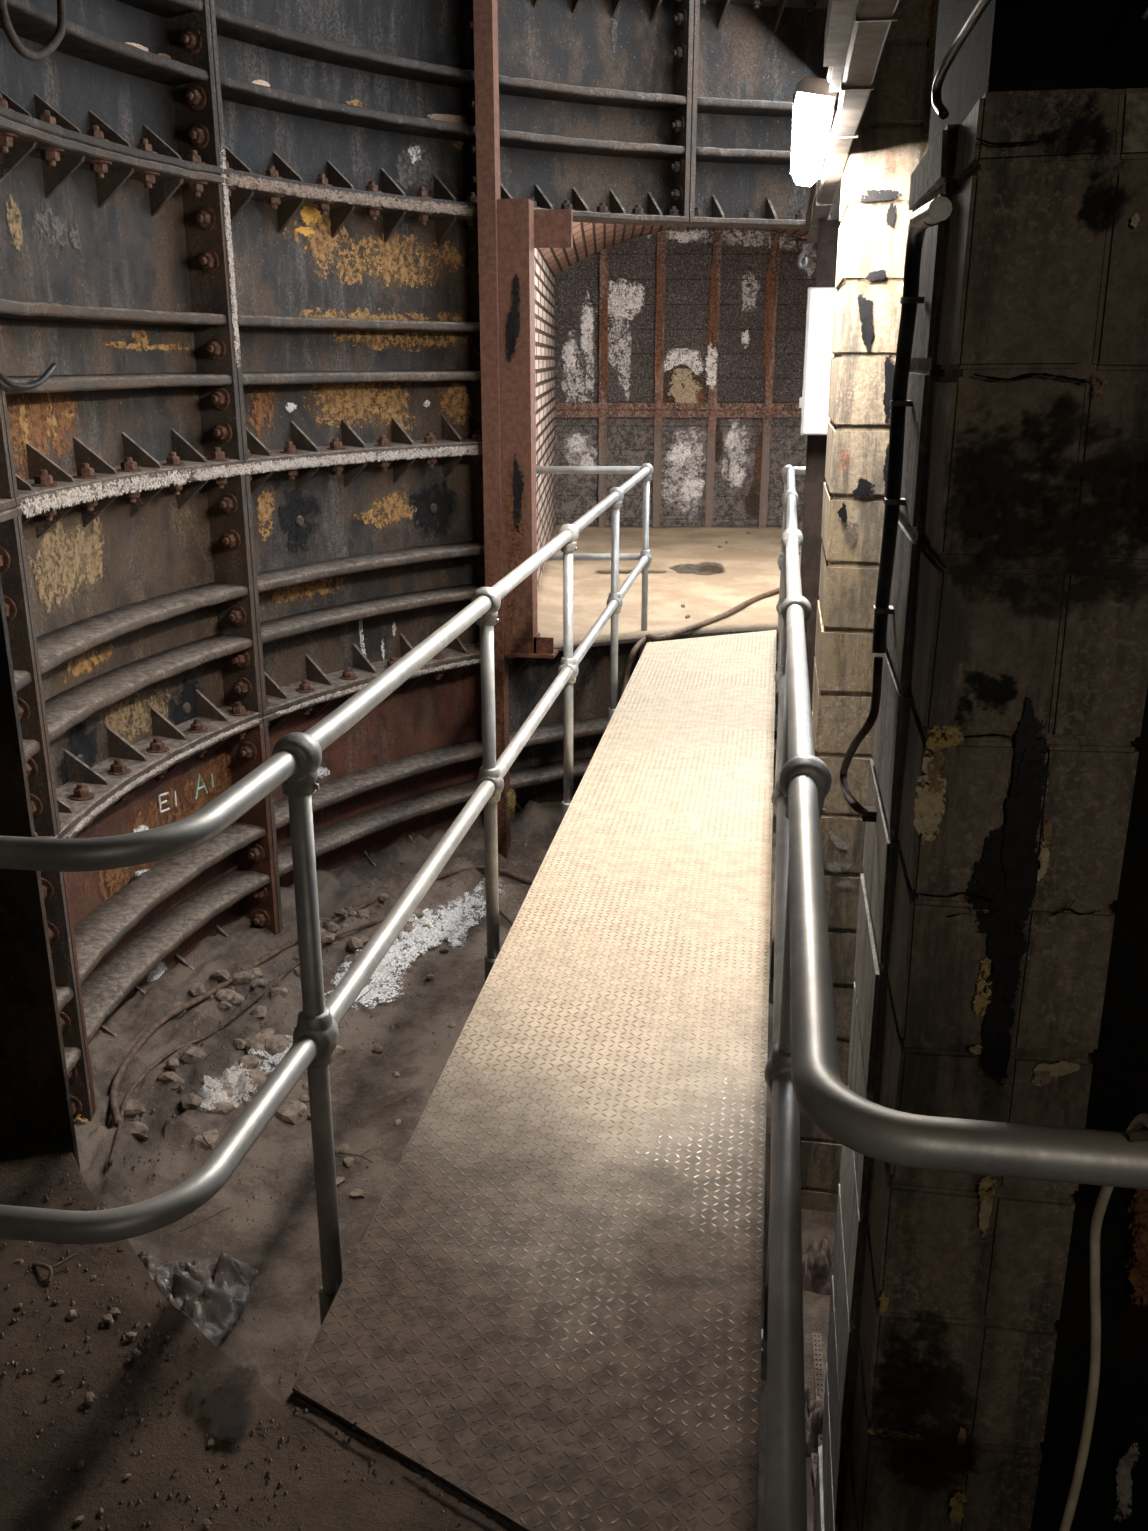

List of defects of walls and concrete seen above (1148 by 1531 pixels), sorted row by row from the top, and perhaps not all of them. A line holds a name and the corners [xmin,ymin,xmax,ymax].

rust [6,373,82,480]
spalling [663,361,708,404]
rust [504,454,526,631]
rust [1126,1189,1148,1305]